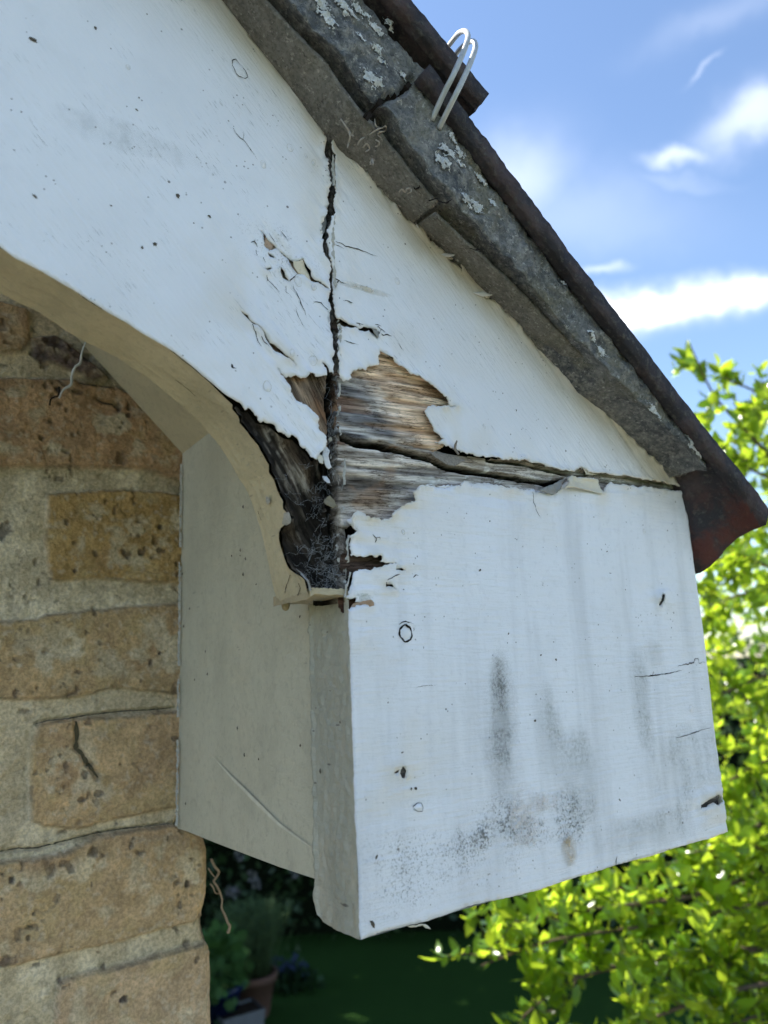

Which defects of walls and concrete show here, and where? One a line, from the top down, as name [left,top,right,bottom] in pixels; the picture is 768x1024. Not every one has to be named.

crack [244,314,287,357]
crack [252,150,404,606]
peeling [280,352,673,530]
peeling [339,553,403,576]
peeling [338,597,374,613]
crack [36,708,168,778]